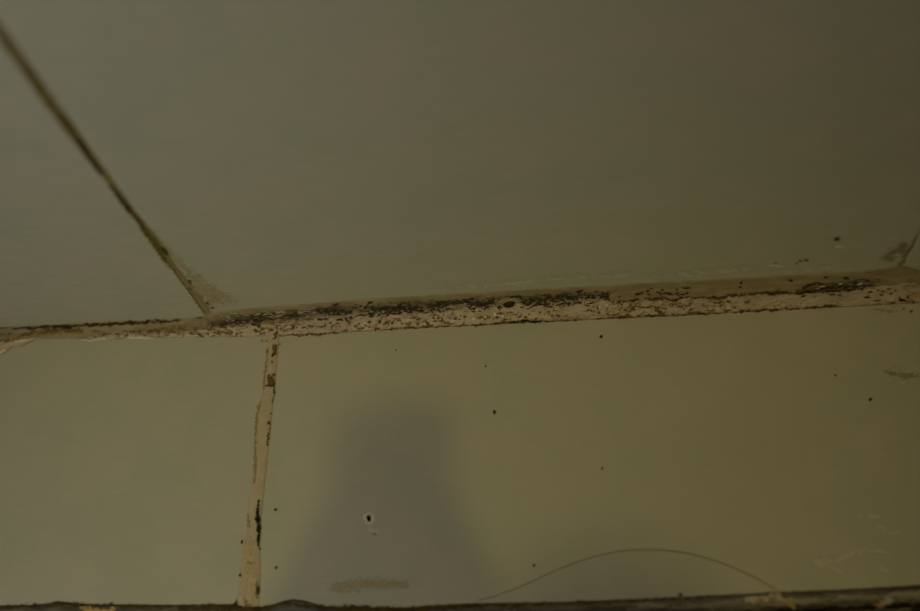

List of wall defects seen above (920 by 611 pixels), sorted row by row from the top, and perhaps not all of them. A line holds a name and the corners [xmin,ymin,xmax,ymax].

leakage [0,26,737,446]
leakage [773,276,915,313]
leakage [254,500,262,550]
leakage [778,603,920,611]